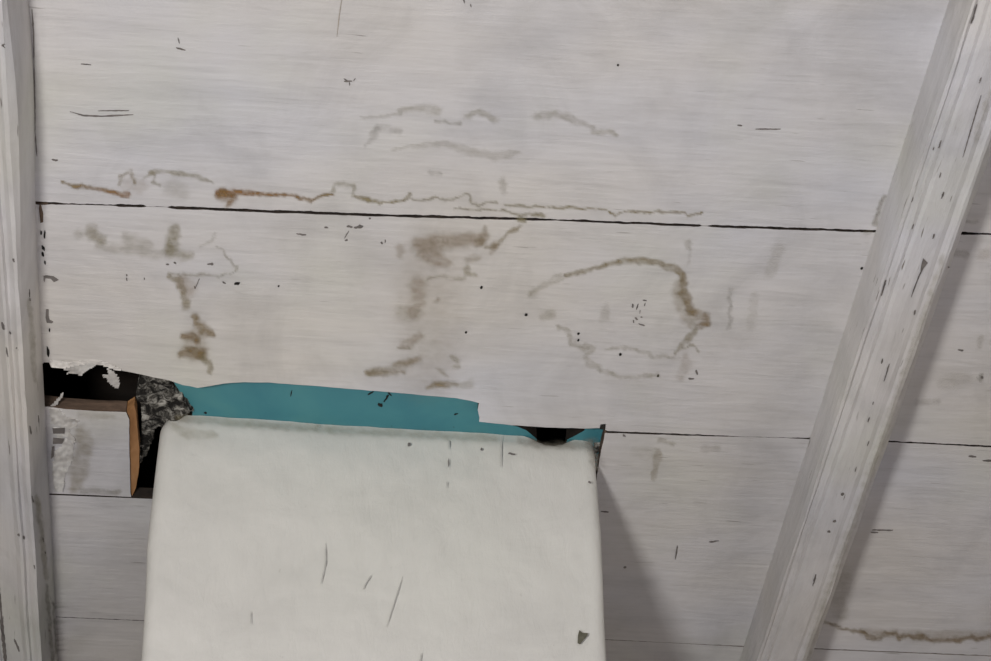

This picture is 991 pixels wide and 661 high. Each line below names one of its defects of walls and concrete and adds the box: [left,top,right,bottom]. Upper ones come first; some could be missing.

leakage [61,181,130,197]
leakage [216,189,333,205]
leakage [677,272,709,326]
peeling [49,360,121,388]